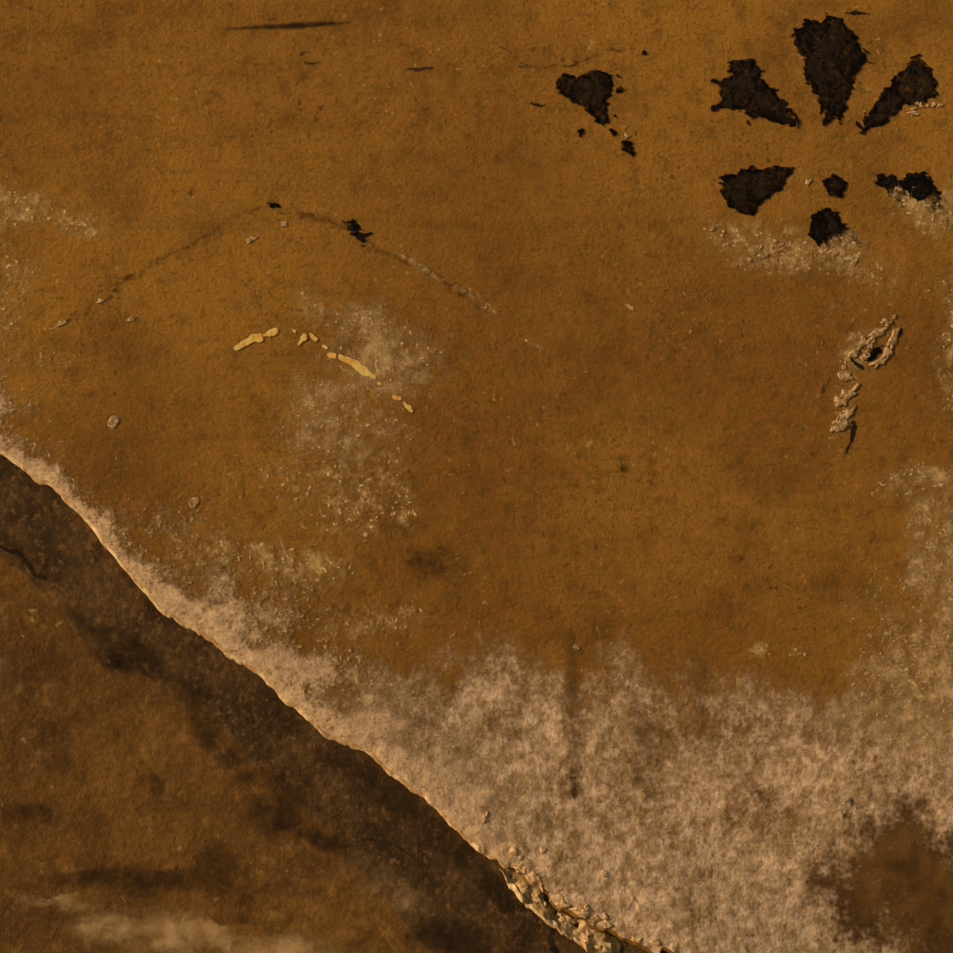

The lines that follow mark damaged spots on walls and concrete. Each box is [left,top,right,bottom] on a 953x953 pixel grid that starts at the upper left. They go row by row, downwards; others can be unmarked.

peeling [556,69,635,156]
peeling [906,101,944,116]
peeling [892,186,948,222]
peeling [710,218,793,270]
spalling [821,314,903,457]
flaking render [108,415,120,429]
crack [0,546,43,579]
efflorescence [170,533,353,591]
spalling [0,450,667,953]
damp [316,463,953,953]